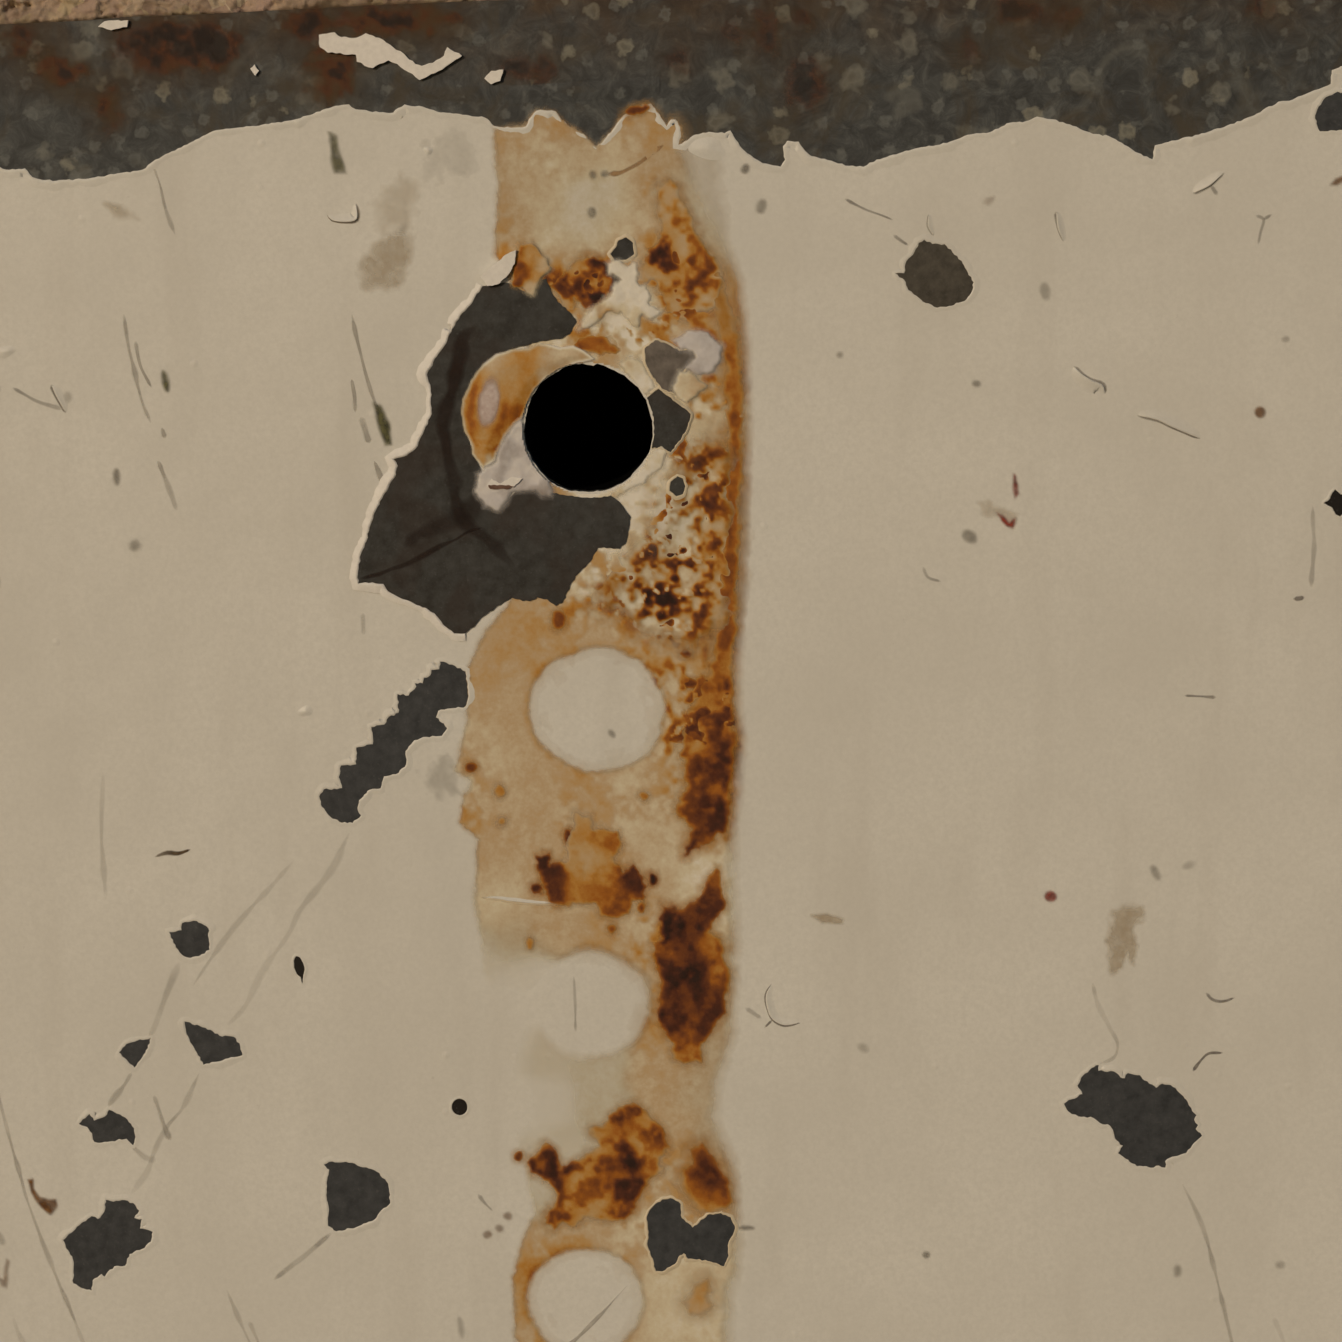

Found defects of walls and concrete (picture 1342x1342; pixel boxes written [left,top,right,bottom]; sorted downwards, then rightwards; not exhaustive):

peeling [0,0,1342,191]
peeling [892,233,980,312]
peeling [349,233,722,641]
peeling [314,657,475,827]
rust [455,103,745,1342]
peeling [164,914,217,964]
peeling [177,1017,247,1069]
peeling [75,1106,140,1150]
peeling [1059,1062,1205,1174]
peeling [56,1193,160,1296]
peeling [317,1156,395,1237]
peeling [643,1195,738,1275]